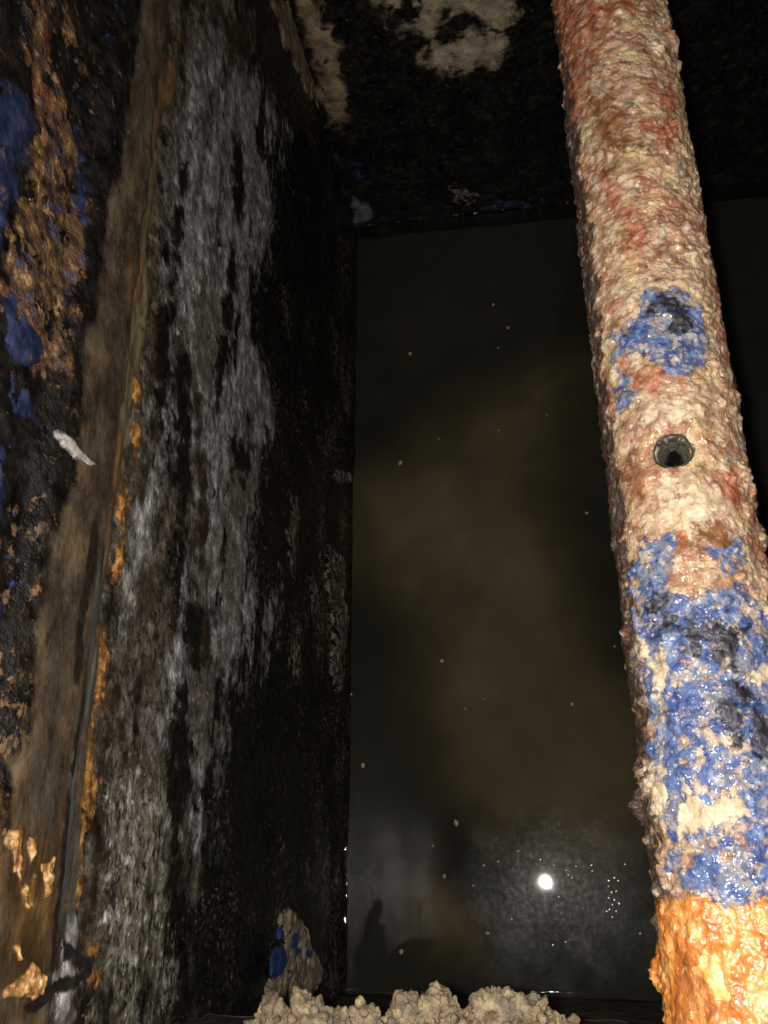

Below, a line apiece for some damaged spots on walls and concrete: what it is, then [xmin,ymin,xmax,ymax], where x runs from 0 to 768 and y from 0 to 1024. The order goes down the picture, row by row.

rust [128,309,166,471]
rust [107,479,133,588]
damp [51,17,292,1024]
rust [189,391,211,575]
rust [551,0,768,1024]
rust [197,603,214,675]
rust [0,624,120,1009]